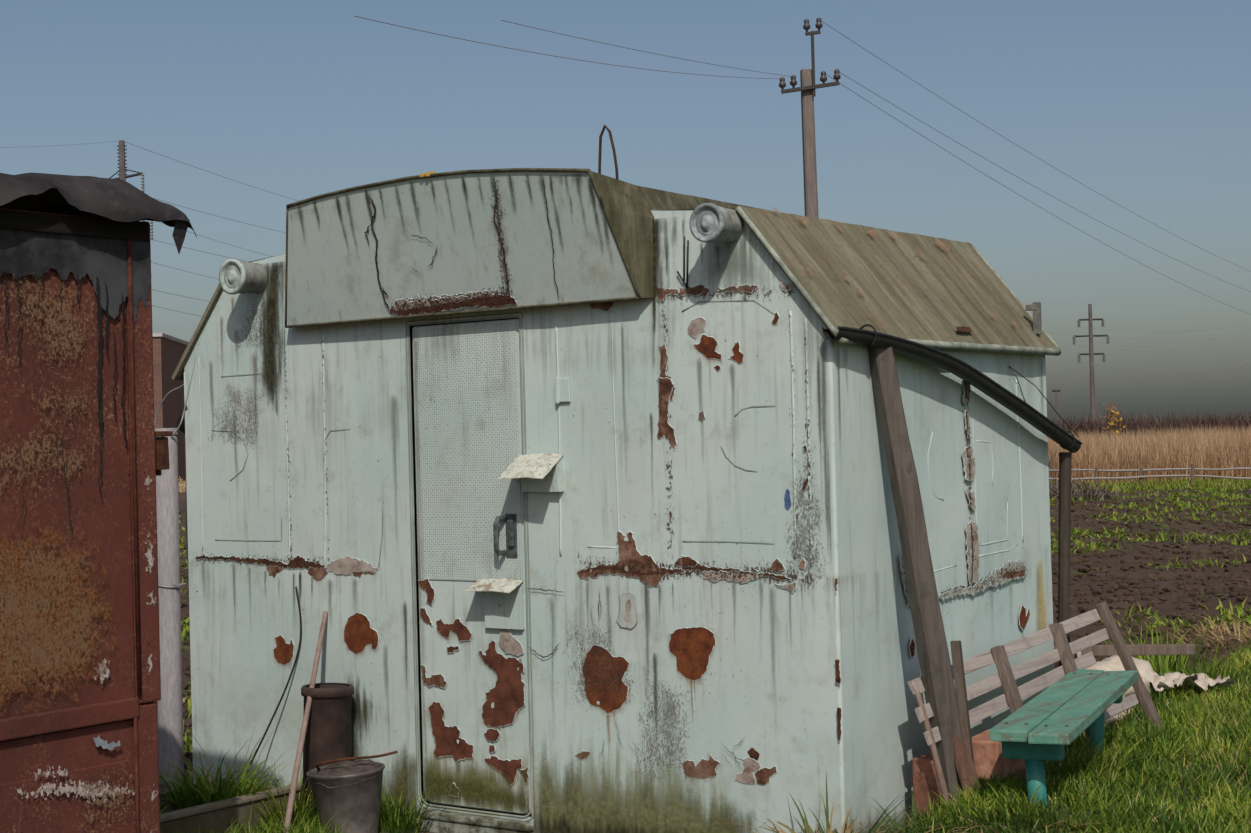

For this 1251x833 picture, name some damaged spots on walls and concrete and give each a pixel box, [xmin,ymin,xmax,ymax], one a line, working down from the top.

leakage [365,183,420,224]
leakage [461,175,515,223]
leakage [526,175,609,245]
crack [364,195,391,312]
leakage [254,262,285,409]
peeling [939,380,1028,612]
corrosion [577,530,807,587]
corrosion [344,612,379,654]
corrosion [418,578,529,786]
corrosion [582,644,630,723]
corrosion [668,626,716,694]
peeling [17,766,136,833]